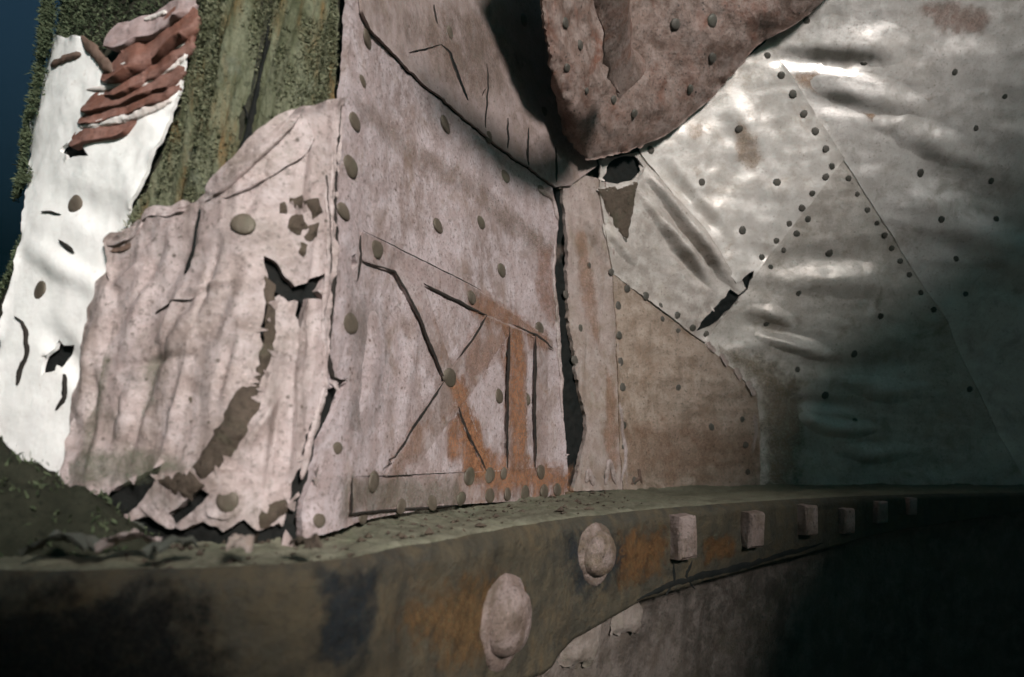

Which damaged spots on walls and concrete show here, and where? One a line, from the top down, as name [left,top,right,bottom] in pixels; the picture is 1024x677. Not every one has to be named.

peeling [50,0,202,162]
peeling [204,109,314,201]
crack [411,4,529,168]
crack [552,147,560,182]
spalling [597,156,647,239]
spalling [100,152,339,547]
corrosion [447,297,571,497]
corrosion [404,573,495,667]